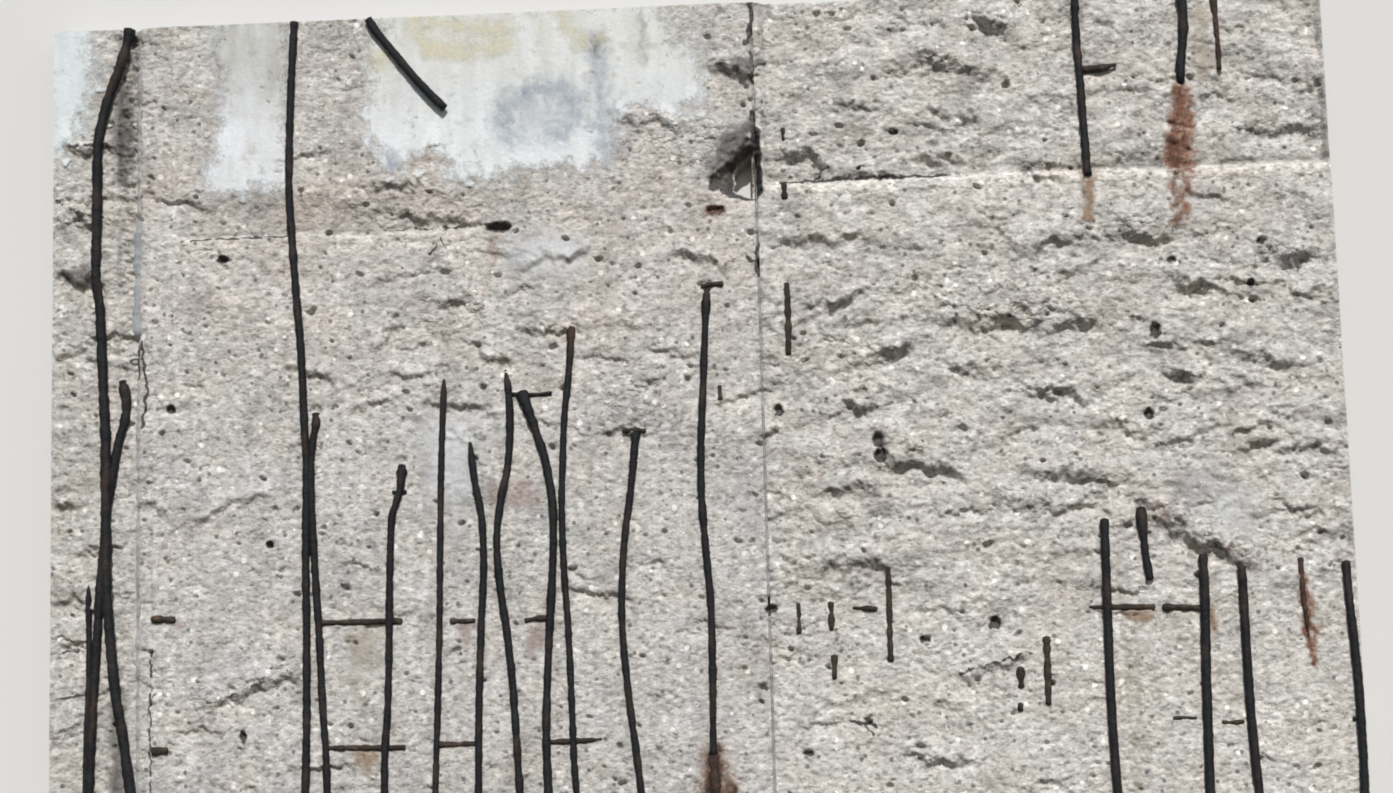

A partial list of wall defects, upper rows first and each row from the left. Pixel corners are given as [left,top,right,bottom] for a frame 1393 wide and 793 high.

peeling [343,5,835,233]
corrosion [1163,84,1198,225]
corrosion [1298,572,1321,666]
corrosion [697,743,744,793]